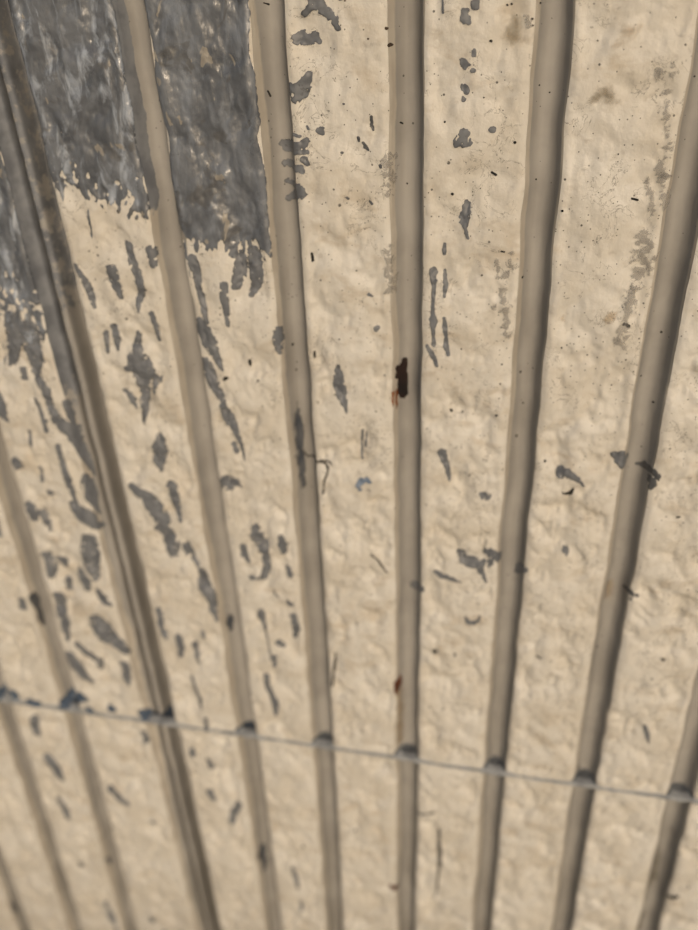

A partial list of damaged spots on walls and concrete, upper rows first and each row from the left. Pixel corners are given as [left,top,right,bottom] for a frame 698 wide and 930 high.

peeling [291,29,322,45]
peeling [301,0,341,31]
peeling [278,125,325,201]
peeling [103,323,163,425]
peeling [125,240,161,341]
peeling [187,253,245,462]
peeling [219,245,264,327]
peeling [425,266,450,368]
peeling [4,310,113,714]
peeling [128,432,219,622]
peeling [456,548,502,583]
peeling [89,614,132,686]